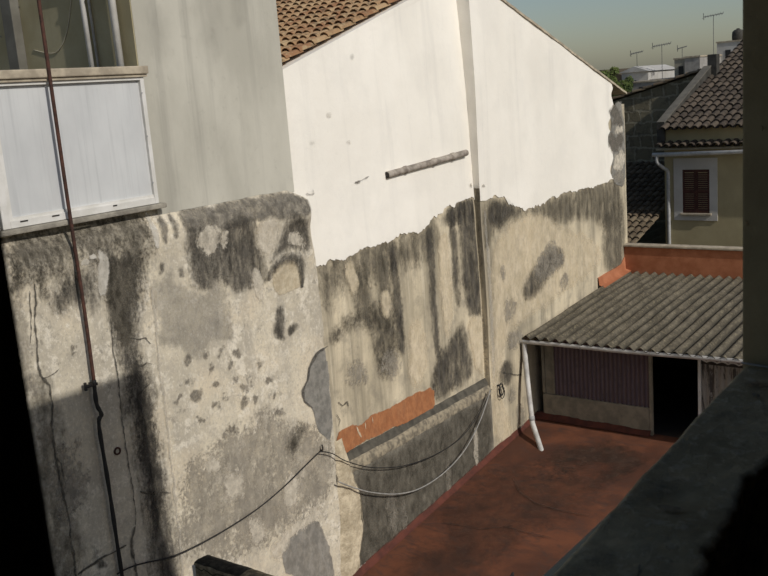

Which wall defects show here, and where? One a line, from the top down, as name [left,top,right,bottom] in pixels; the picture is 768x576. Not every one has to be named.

crack [29,284,177,576]
damp [6,193,334,576]
peeling [302,346,435,453]
damp [321,182,624,397]
damp [502,361,525,428]